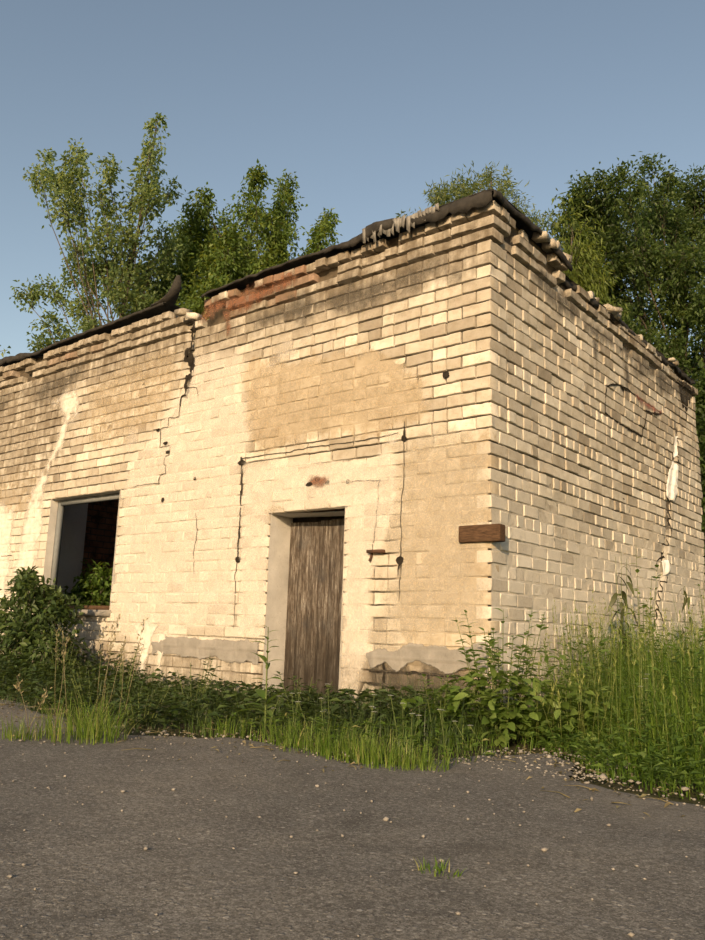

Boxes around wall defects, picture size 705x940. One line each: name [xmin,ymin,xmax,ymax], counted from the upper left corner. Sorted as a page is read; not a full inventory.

damp [330,270,433,314]
damp [0,369,79,613]
crack [133,318,198,502]
flaking render [366,642,488,710]